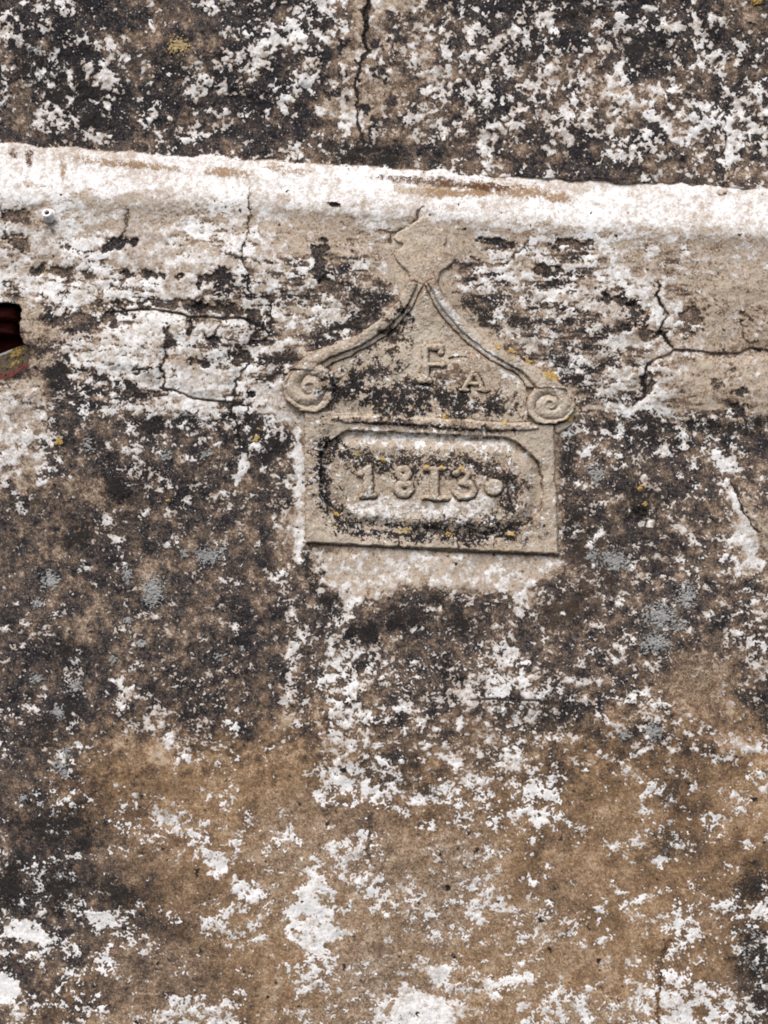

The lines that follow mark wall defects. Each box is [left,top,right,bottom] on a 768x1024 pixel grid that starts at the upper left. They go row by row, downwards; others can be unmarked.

crack [354,0,371,141]
crack [112,196,273,343]
crack [632,282,768,406]
leakage [93,372,216,435]
crack [159,347,245,445]
leakage [234,411,287,463]
leakage [64,515,95,558]
leakage [301,552,345,620]
leakage [347,589,490,645]
leakage [47,633,84,668]
leakage [26,694,85,753]
leakage [476,692,553,720]